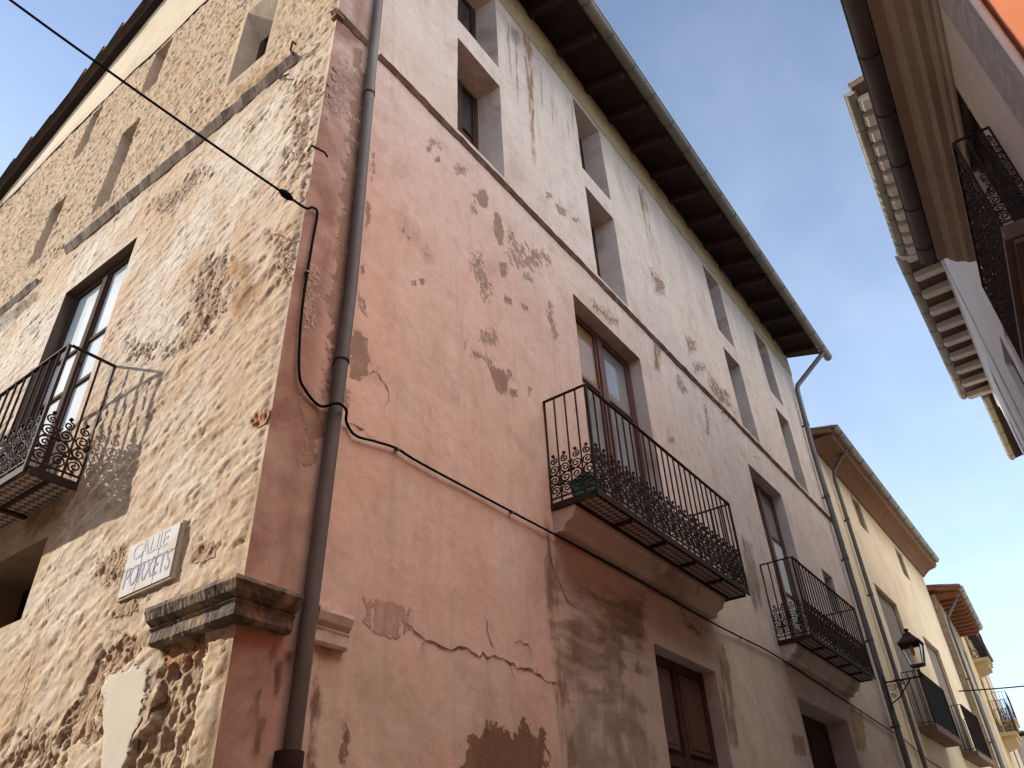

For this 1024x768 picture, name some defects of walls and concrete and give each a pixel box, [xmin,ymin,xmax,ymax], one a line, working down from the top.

peeling [268,46,371,392]
peeling [469,188,551,311]
peeling [545,300,558,340]
peeling [344,330,371,409]
peeling [464,326,532,397]
crack [408,619,562,701]
spalling [123,636,208,768]
peeling [460,716,551,768]